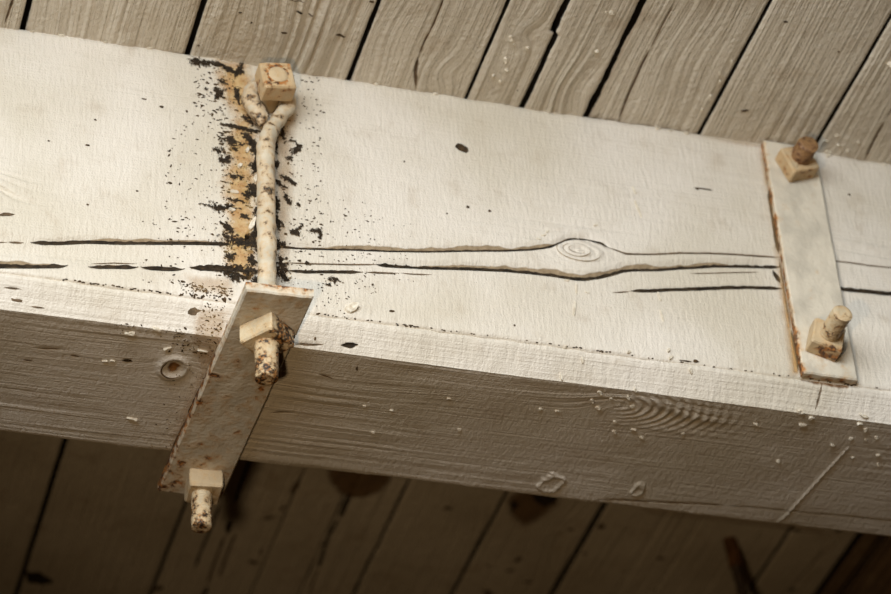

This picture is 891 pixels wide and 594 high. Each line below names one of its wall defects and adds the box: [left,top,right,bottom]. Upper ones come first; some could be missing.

rust [222,65,253,270]
crack [0,239,233,289]
crack [280,153,798,369]
crack [836,260,891,268]
crack [840,287,891,296]